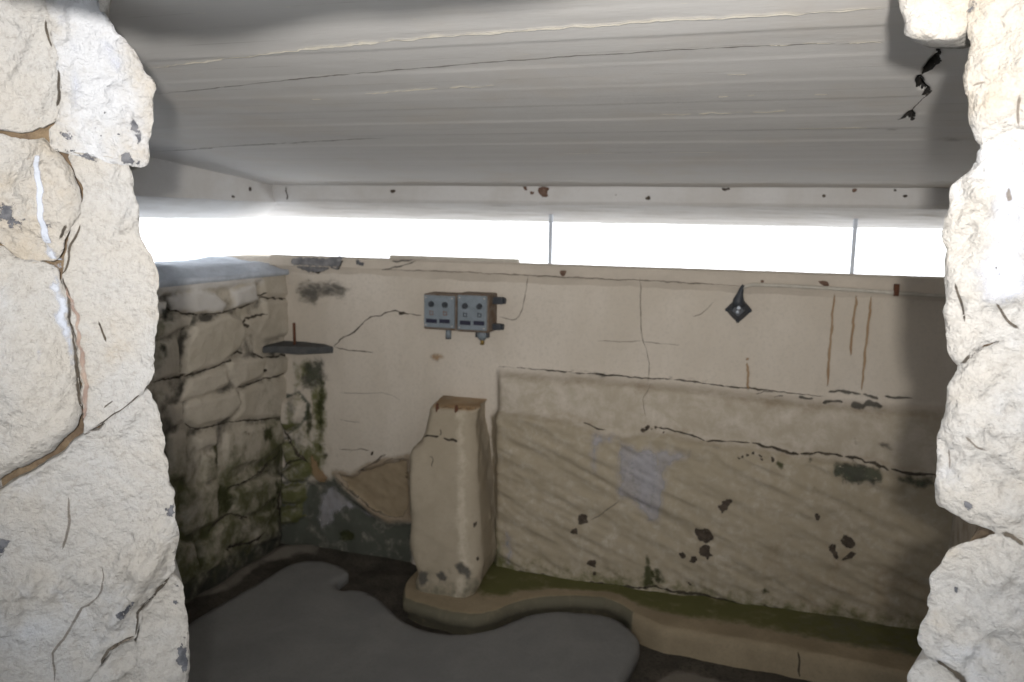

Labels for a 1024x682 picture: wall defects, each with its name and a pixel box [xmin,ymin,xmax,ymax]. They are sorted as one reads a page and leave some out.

damp [301,284,344,302]
crack [334,310,421,353]
corrosion [818,281,835,386]
corrosion [850,296,871,390]
damp [301,362,323,388]
crack [383,259,984,476]
damp [834,463,882,484]
efflorescence [321,488,352,523]
peeling [718,499,732,513]
peeling [679,528,714,563]
peeling [829,535,856,561]